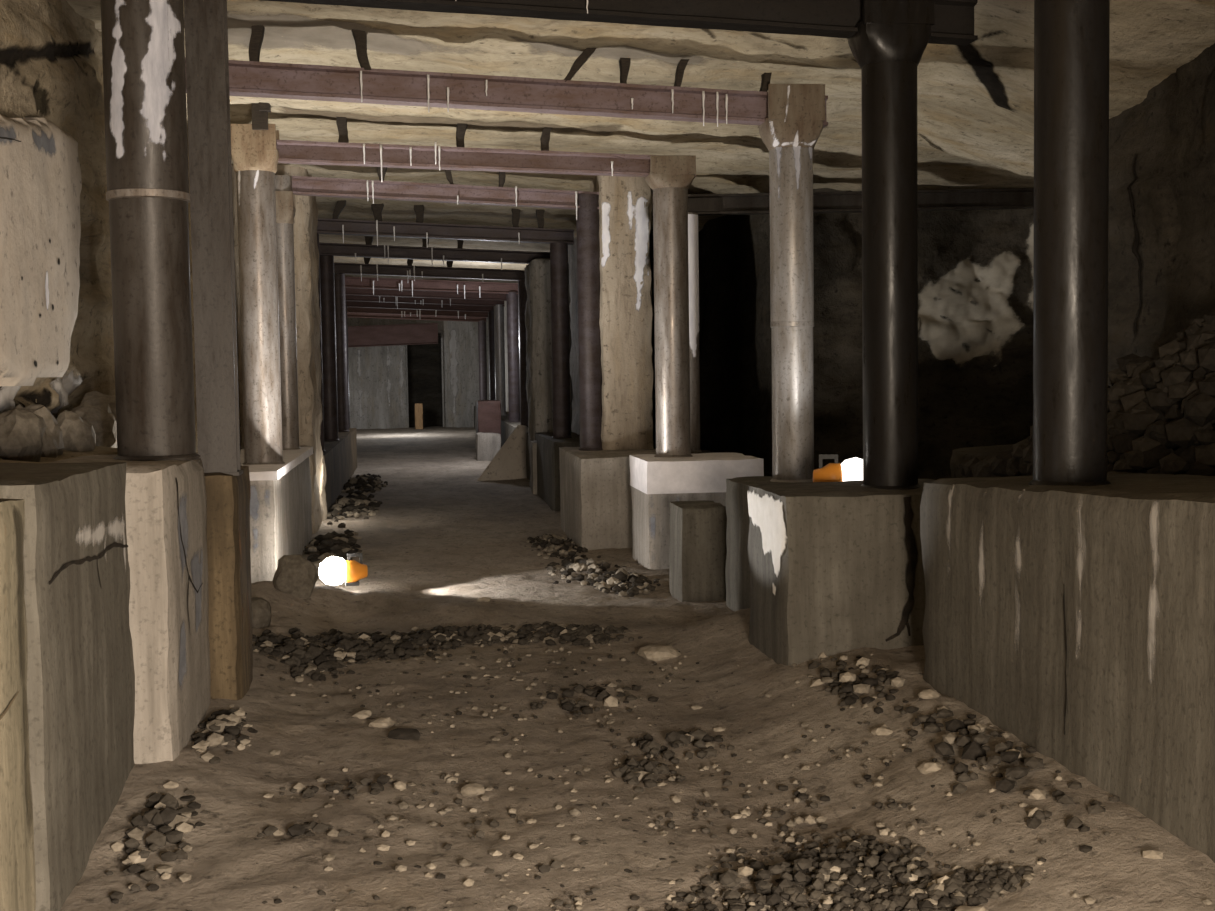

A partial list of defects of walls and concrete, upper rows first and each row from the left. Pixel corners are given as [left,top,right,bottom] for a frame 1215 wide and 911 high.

leakage [601,202,611,266]
leakage [627,192,649,310]
spalling [0,360,83,414]
crack [49,542,128,586]
crack [0,691,19,720]